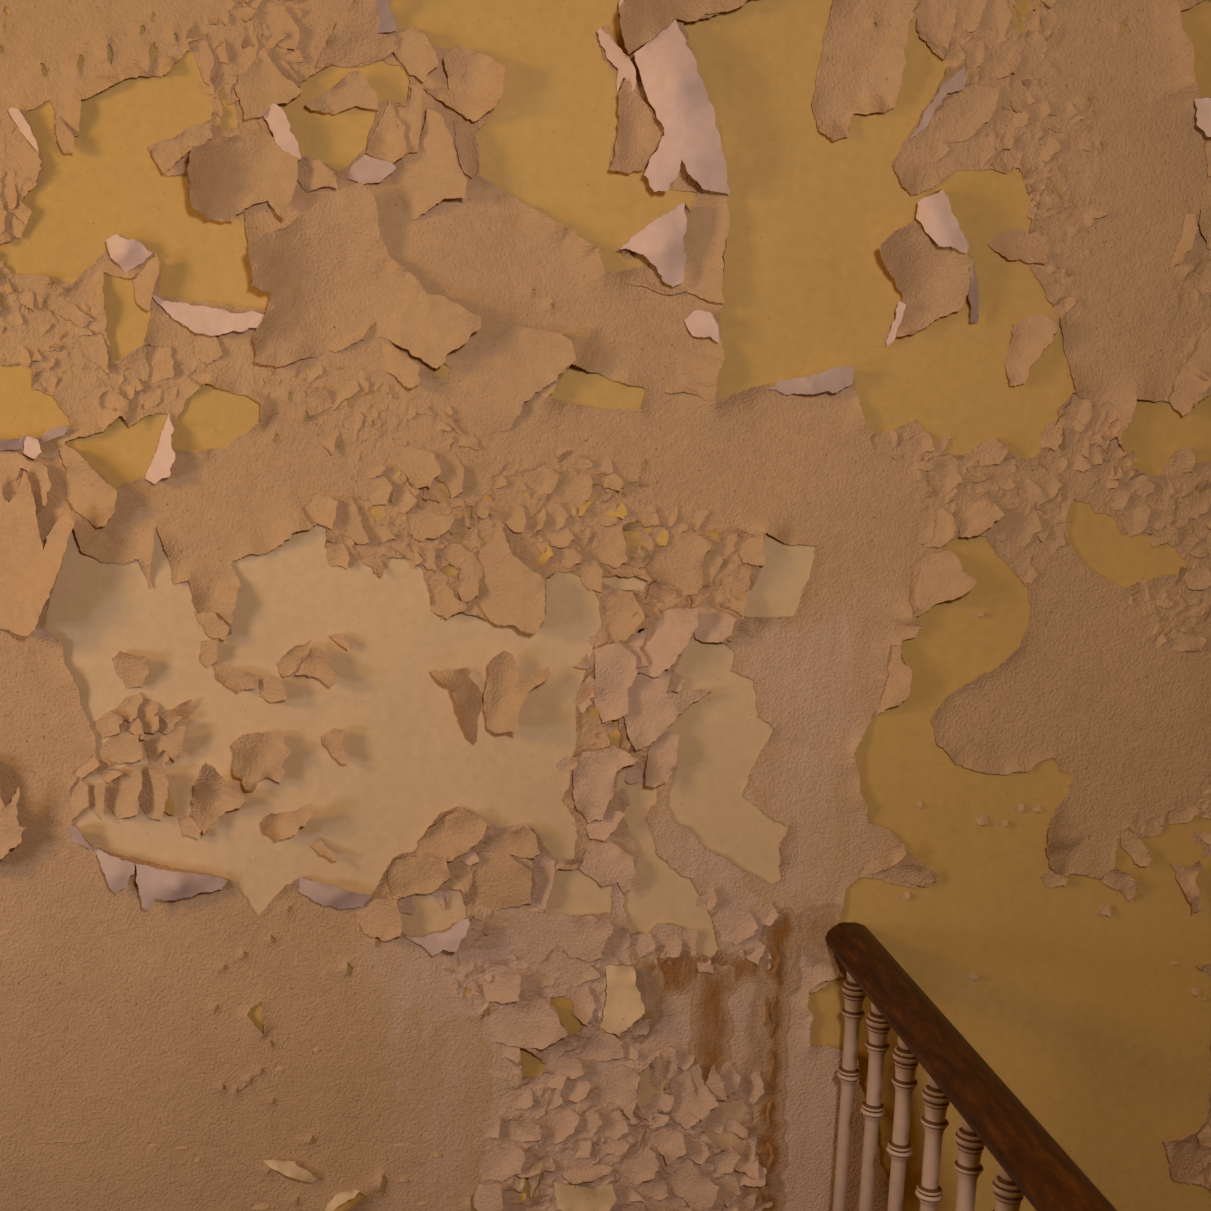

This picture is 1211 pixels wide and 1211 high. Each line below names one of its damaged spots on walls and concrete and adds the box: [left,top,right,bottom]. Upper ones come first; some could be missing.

peeling [238,0,308,63]
peeling [919,47,1035,167]
peeling [960,0,1063,79]
peeling [1168,0,1211,137]
peeling [1014,384,1211,619]
peeling [0,360,816,986]
peeling [241,1002,274,1047]
peeling [470,947,773,1211]
peeling [263,1159,318,1183]
peeling [325,1176,409,1211]